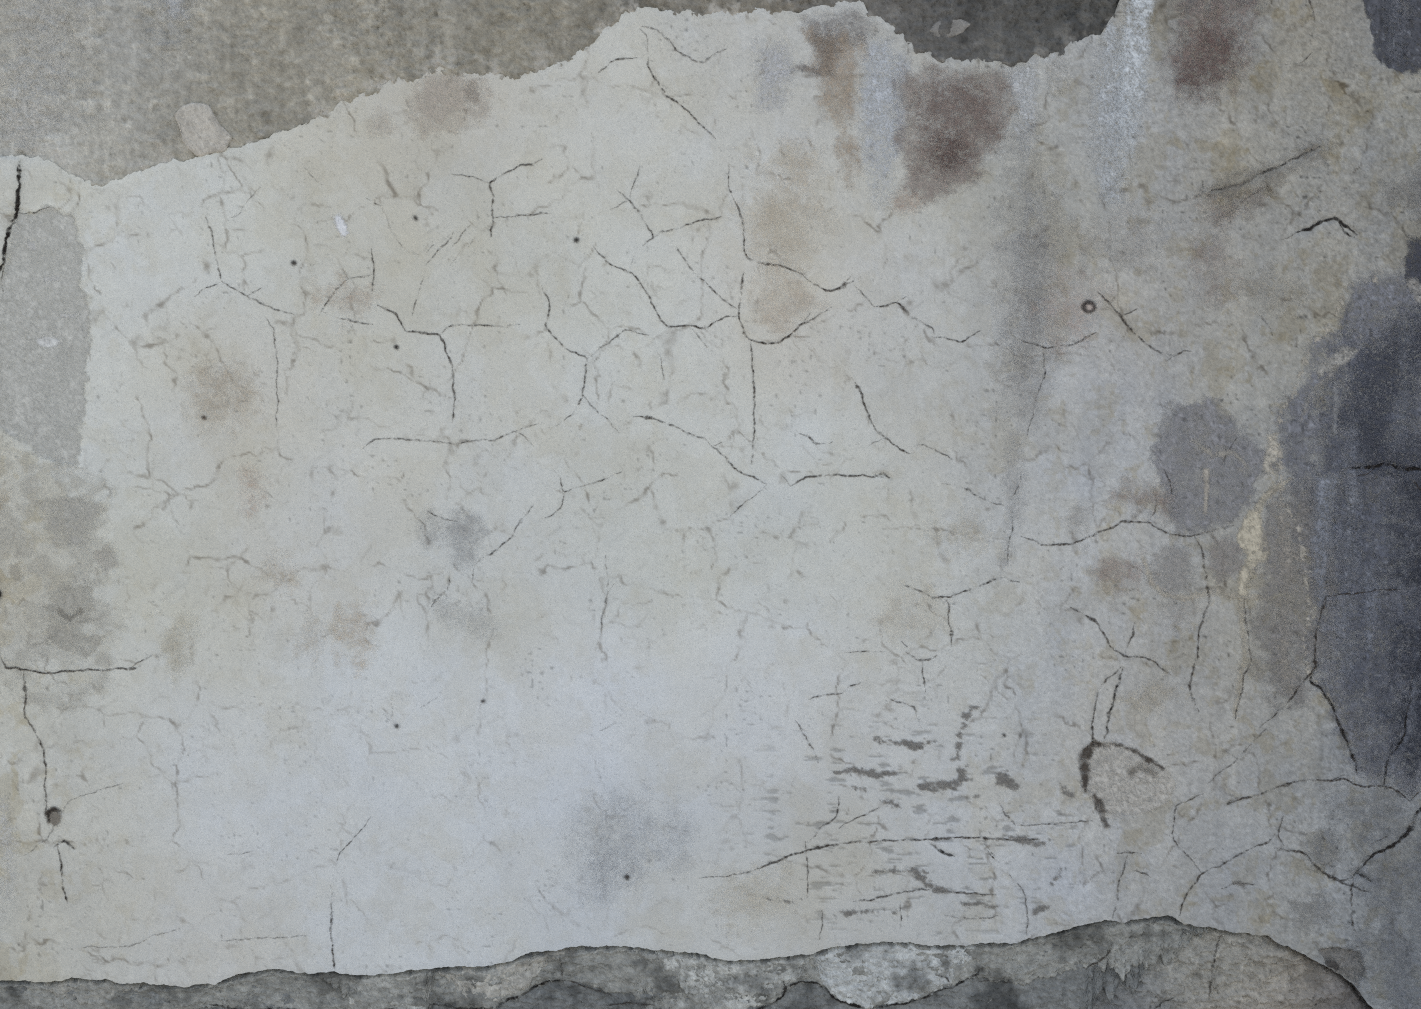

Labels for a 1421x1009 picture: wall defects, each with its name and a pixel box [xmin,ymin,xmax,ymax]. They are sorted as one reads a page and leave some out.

peeling [0,0,1119,187]
damp [813,13,908,188]
peeling [1364,0,1421,73]
crack [0,166,48,273]
peeling [0,205,90,485]
crack [324,161,979,512]
crack [966,476,1210,739]
damp [1245,240,1421,1009]
crack [726,799,1086,933]
spalling [1080,741,1175,827]
crack [1172,589,1421,926]
spalling [0,915,1373,1009]